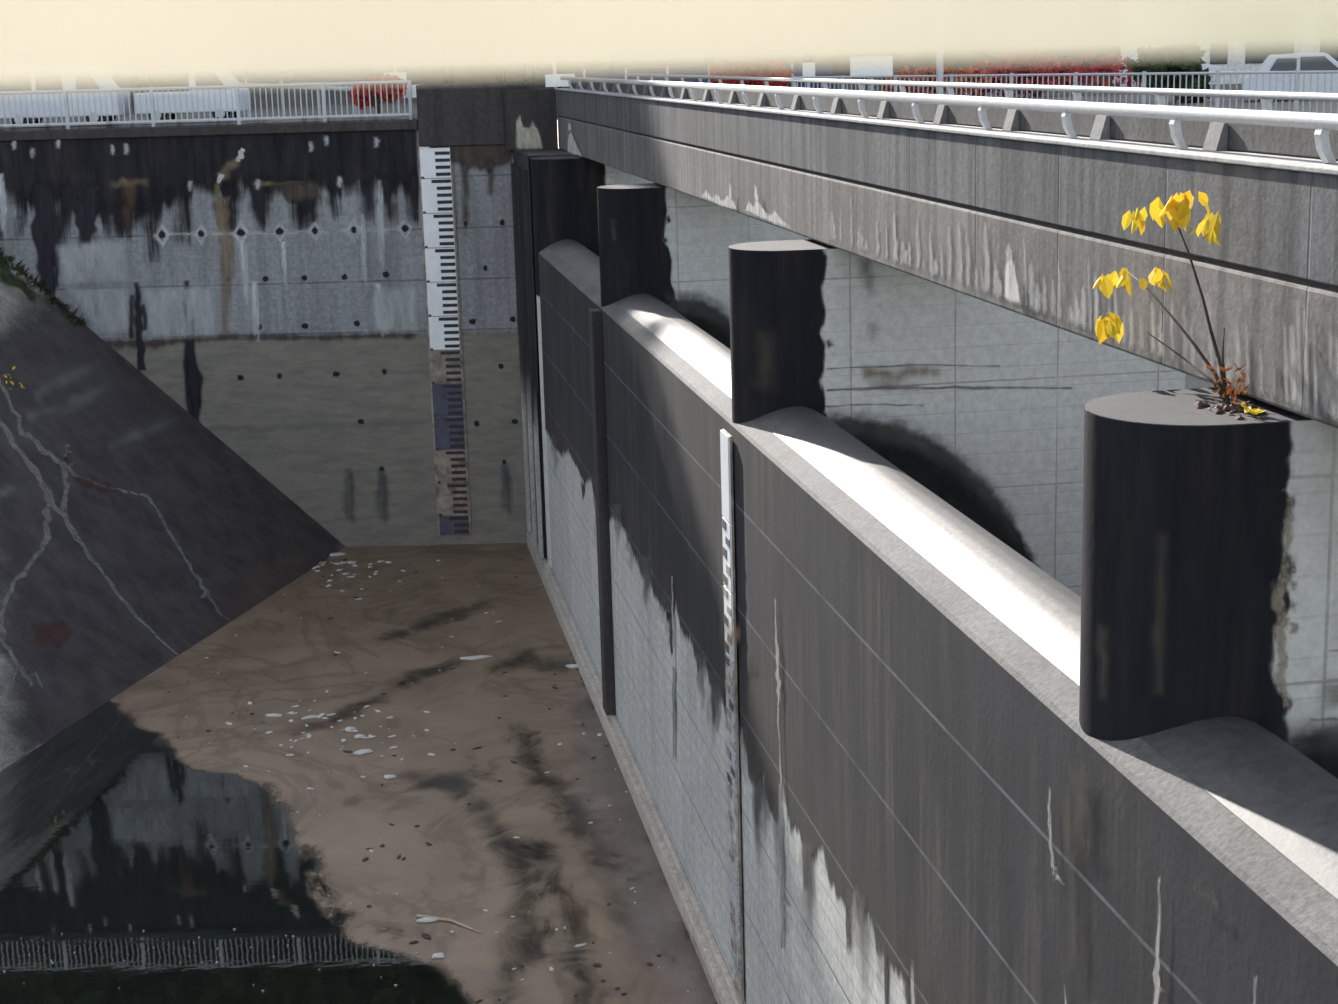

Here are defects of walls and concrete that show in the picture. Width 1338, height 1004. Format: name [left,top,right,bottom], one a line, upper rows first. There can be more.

corrosion [217,186,232,322]
leakage [830,209,1098,326]
leakage [0,118,528,547]
leakage [1131,306,1173,353]
leakage [1211,339,1248,378]
leakage [1285,338,1338,414]
crack [0,379,231,697]
peeling [1272,498,1298,707]
crack [775,633,789,948]
crack [1048,794,1058,878]
crack [1152,906,1160,1004]